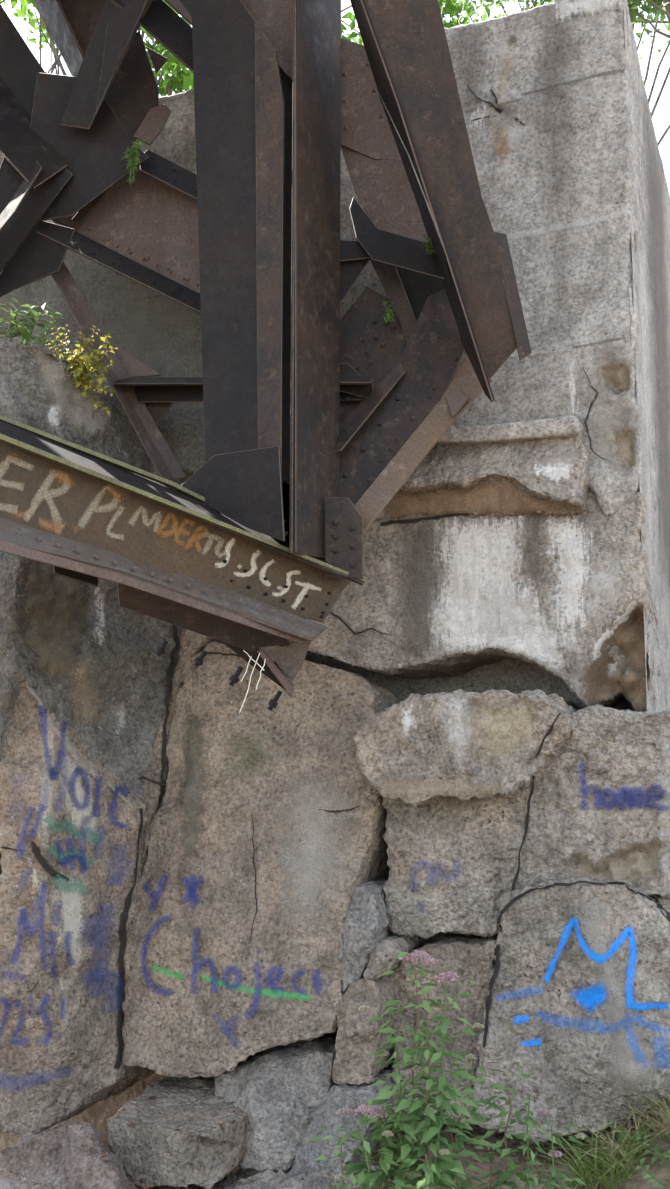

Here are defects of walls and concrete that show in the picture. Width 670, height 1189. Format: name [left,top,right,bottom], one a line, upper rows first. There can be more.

spalling [532,342,639,488]
spalling [380,477,574,526]
damp [404,515,622,672]
spalling [579,601,650,712]
crack [114,625,240,1069]
crack [250,812,258,942]
crack [483,713,670,1048]